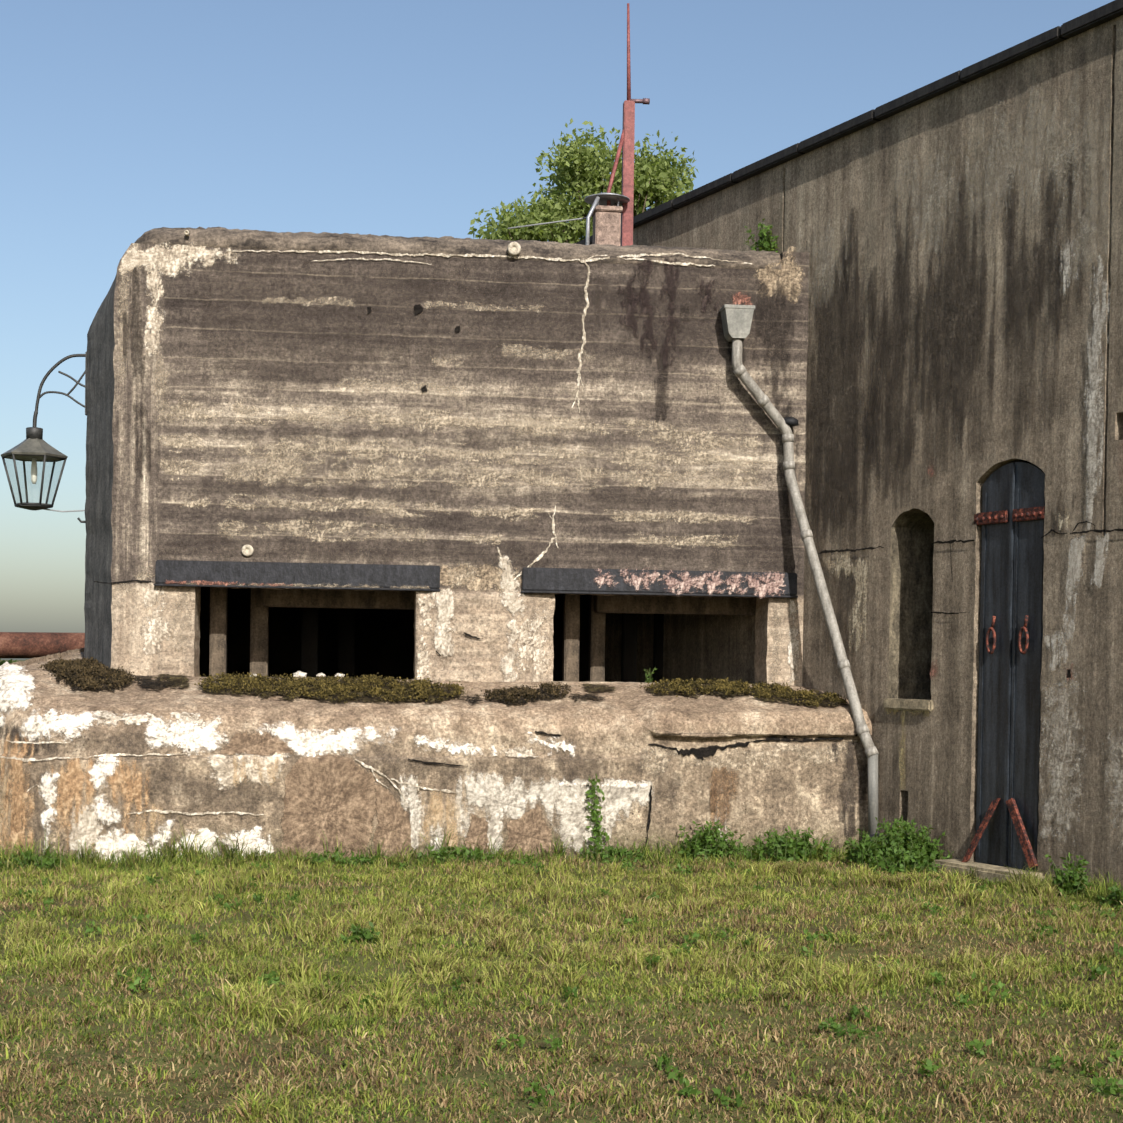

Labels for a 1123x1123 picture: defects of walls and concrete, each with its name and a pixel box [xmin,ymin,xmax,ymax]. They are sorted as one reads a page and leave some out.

crack [226,250,752,413]
water stain [618,257,718,420]
water stain [729,152,1109,603]
crack [509,506,559,585]
peeling [595,569,786,597]
crack [817,546,884,554]
crack [932,540,975,582]
crack [1041,521,1123,538]
water stain [1045,615,1074,670]
spalling [0,661,414,865]
crack [648,734,858,761]